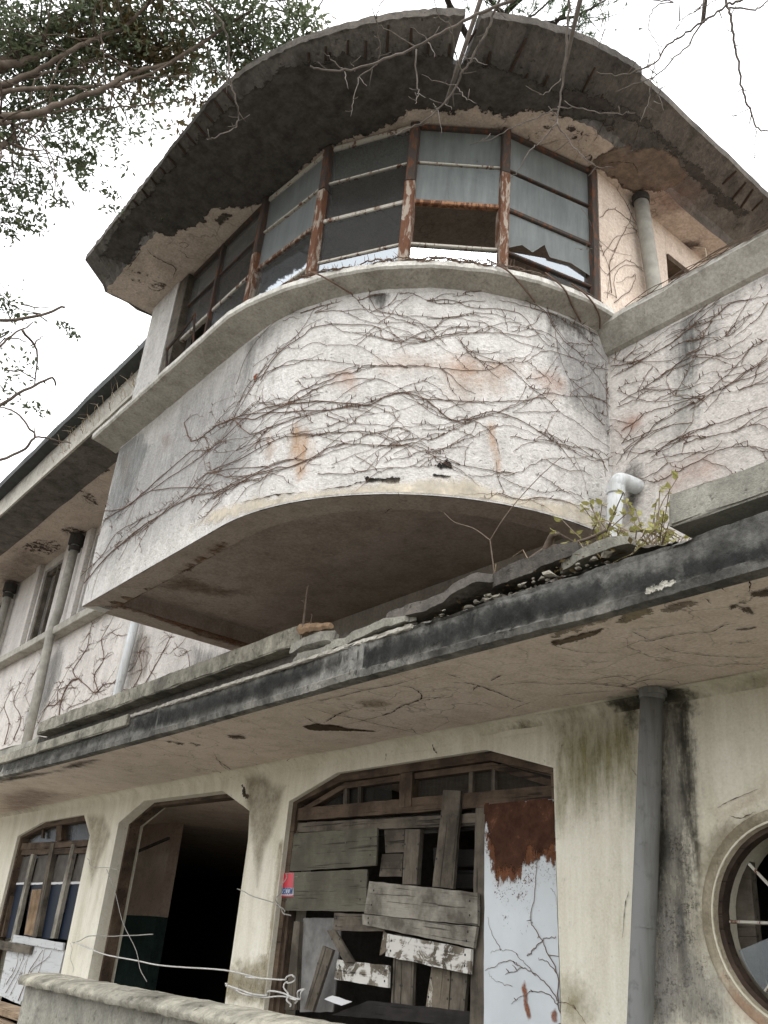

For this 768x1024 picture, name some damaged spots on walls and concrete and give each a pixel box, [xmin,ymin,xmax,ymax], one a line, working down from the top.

spalling [99,25,763,291]
peeling [208,459,606,530]
damp [355,542,768,675]
peeling [551,601,698,647]
peeling [645,580,675,594]
crack [622,623,764,667]
damp [0,654,341,783]
crack [304,646,680,753]
damp [614,695,640,718]
rust [484,798,556,900]
damp [654,688,722,1024]